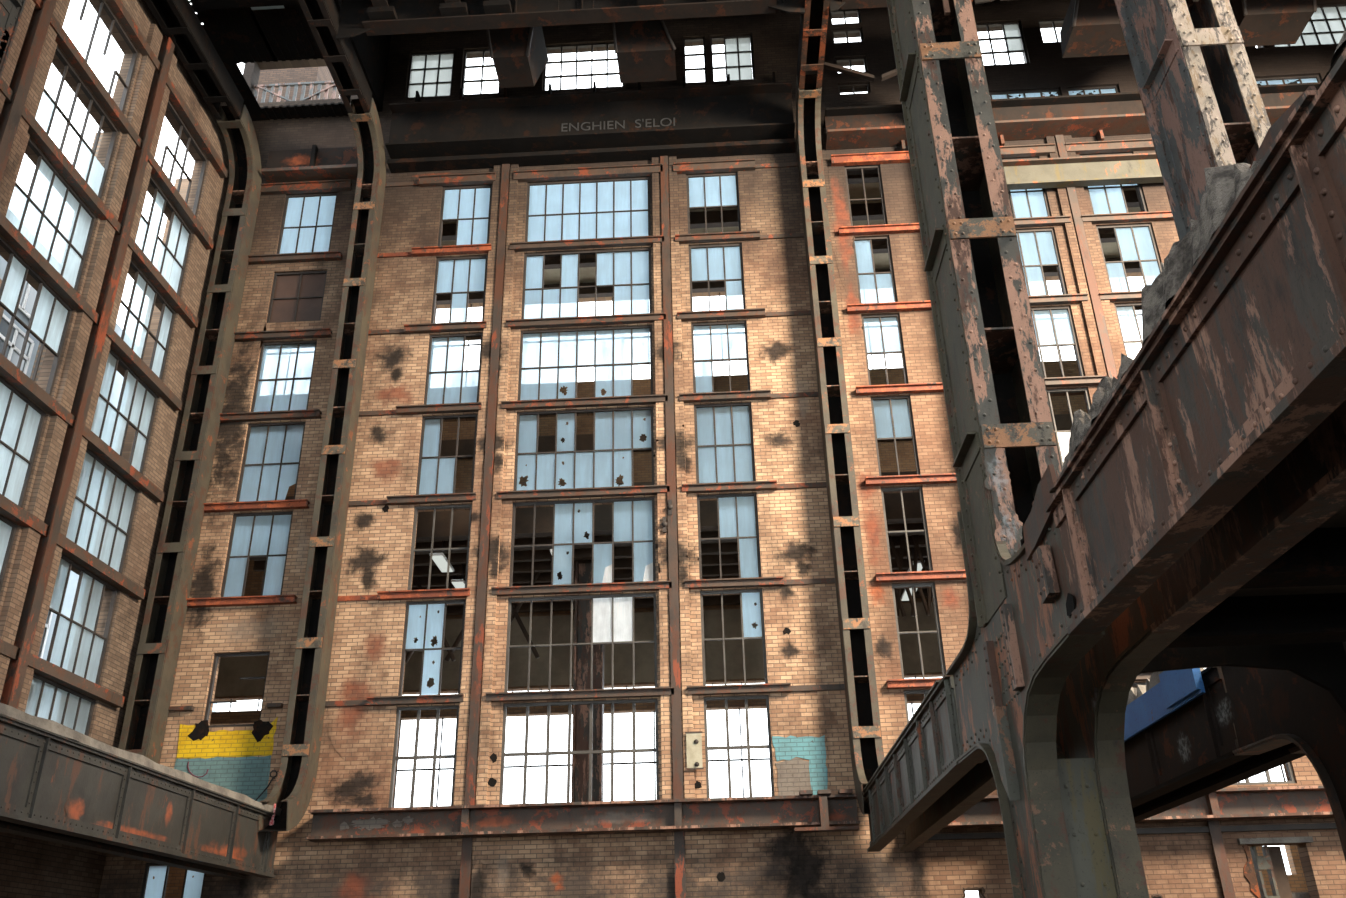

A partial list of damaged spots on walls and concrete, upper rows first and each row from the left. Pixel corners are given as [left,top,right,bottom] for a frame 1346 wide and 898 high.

damp [356,563,382,595]
damp [790,553,814,579]
damp [328,790,388,809]
damp [752,829,810,870]